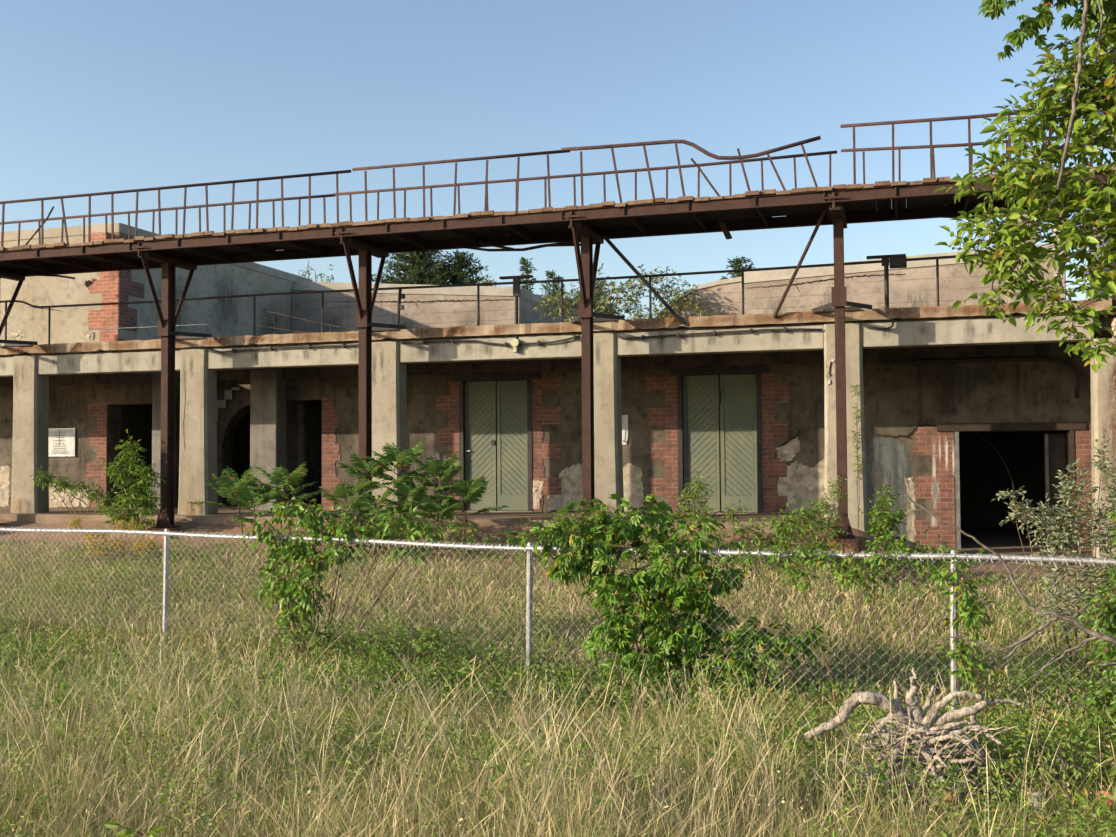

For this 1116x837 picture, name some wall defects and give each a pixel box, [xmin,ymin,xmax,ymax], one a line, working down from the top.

spalling [532,463,582,511]
spalling [775,436,824,512]